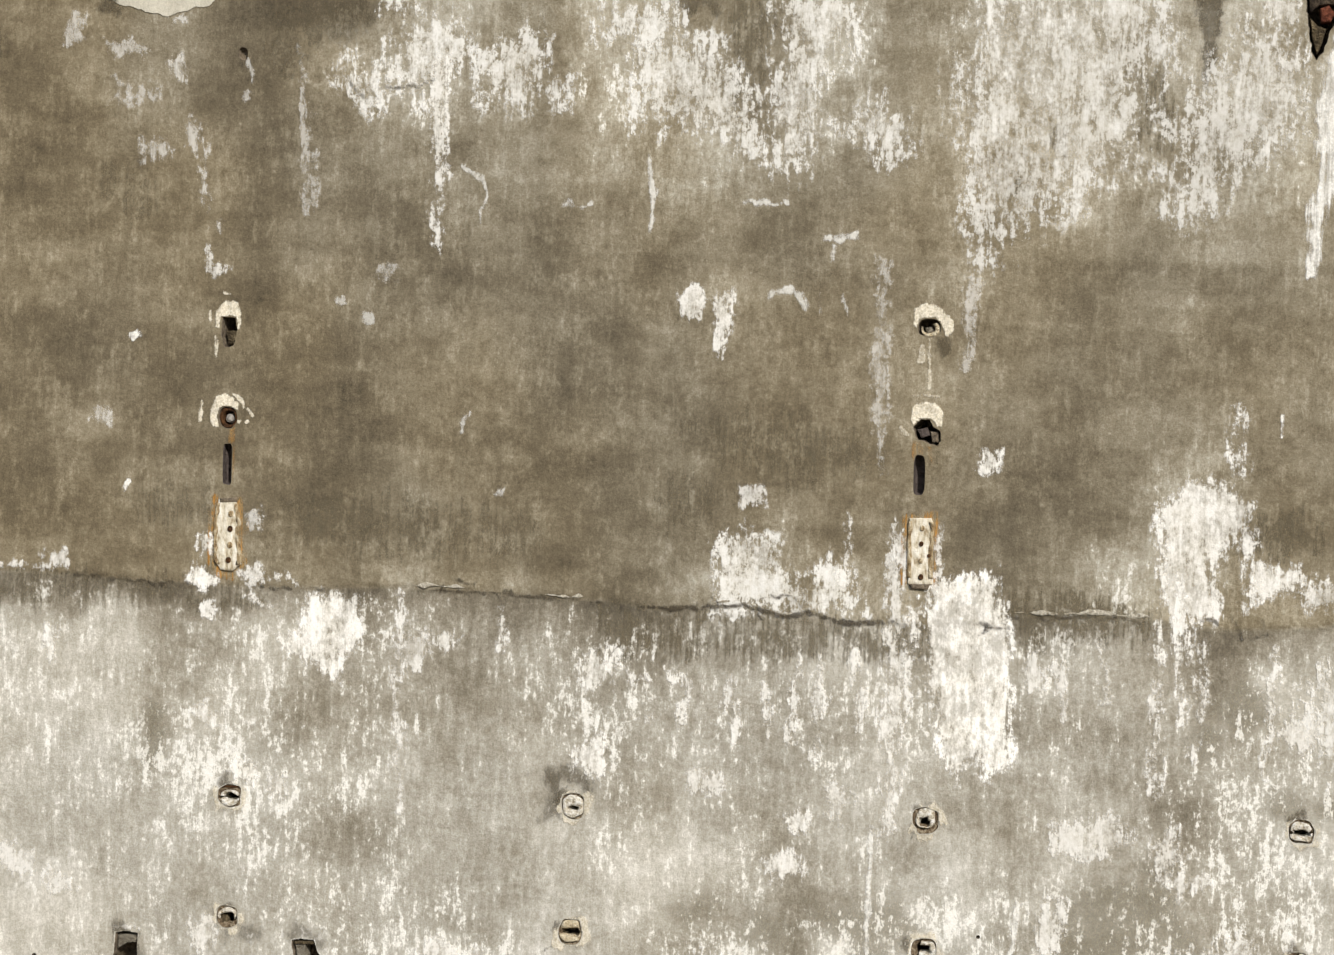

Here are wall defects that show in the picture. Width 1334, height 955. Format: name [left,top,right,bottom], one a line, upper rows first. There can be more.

peeling [330,0,575,250]
peeling [590,0,916,179]
peeling [942,0,1334,268]
peeling [648,157,658,230]
crack [65,572,188,586]
crack [423,578,602,603]
crack [640,594,898,627]
crack [980,614,1133,634]
crack [1201,618,1268,641]
peeling [1145,404,1334,796]
peeling [709,485,1069,955]
peeling [1048,811,1214,901]